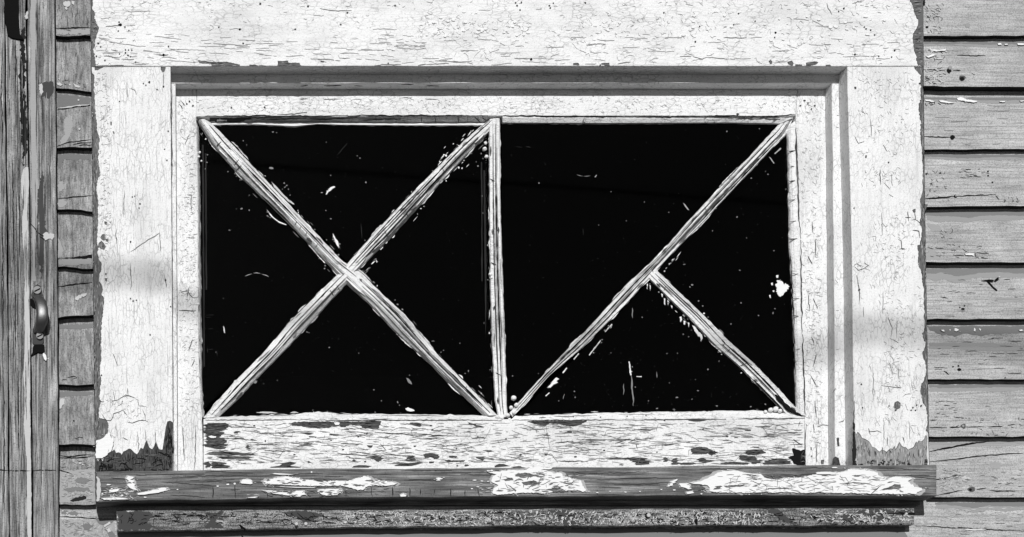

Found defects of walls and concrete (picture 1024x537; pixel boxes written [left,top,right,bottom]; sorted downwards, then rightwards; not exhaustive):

peeling [21,0,173,537]
peeling [395,445,611,496]
crack [92,0,923,496]
peeling [529,416,587,433]
peeling [603,0,986,496]